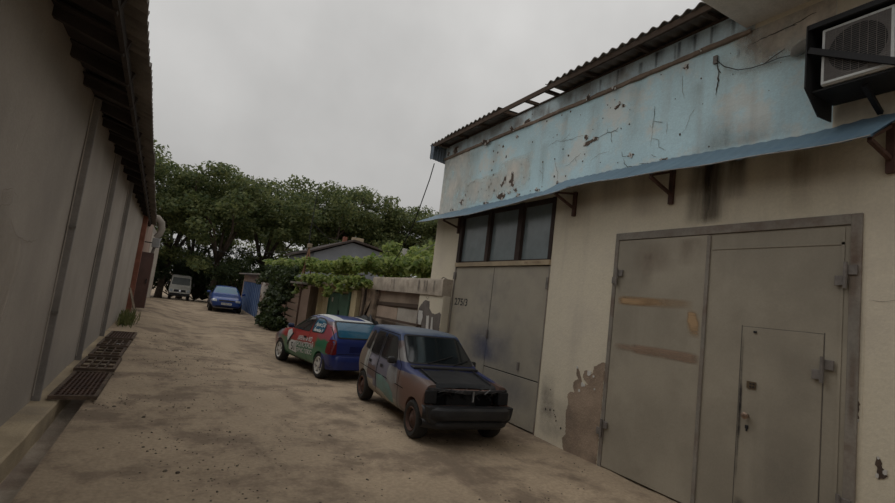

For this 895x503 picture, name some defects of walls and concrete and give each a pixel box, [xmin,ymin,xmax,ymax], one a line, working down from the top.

peeling [450,140,540,211]
crack [539,109,694,179]
spalling [545,362,605,464]
spalling [875,456,888,479]